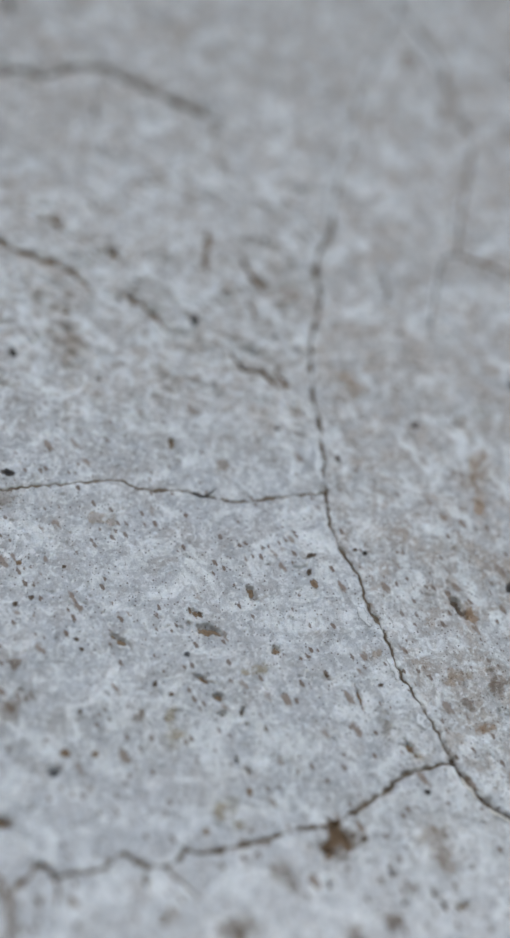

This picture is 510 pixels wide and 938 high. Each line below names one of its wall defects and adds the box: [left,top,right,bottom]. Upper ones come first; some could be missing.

crack [0,52,216,122]
crack [0,108,510,822]
crack [0,824,338,938]